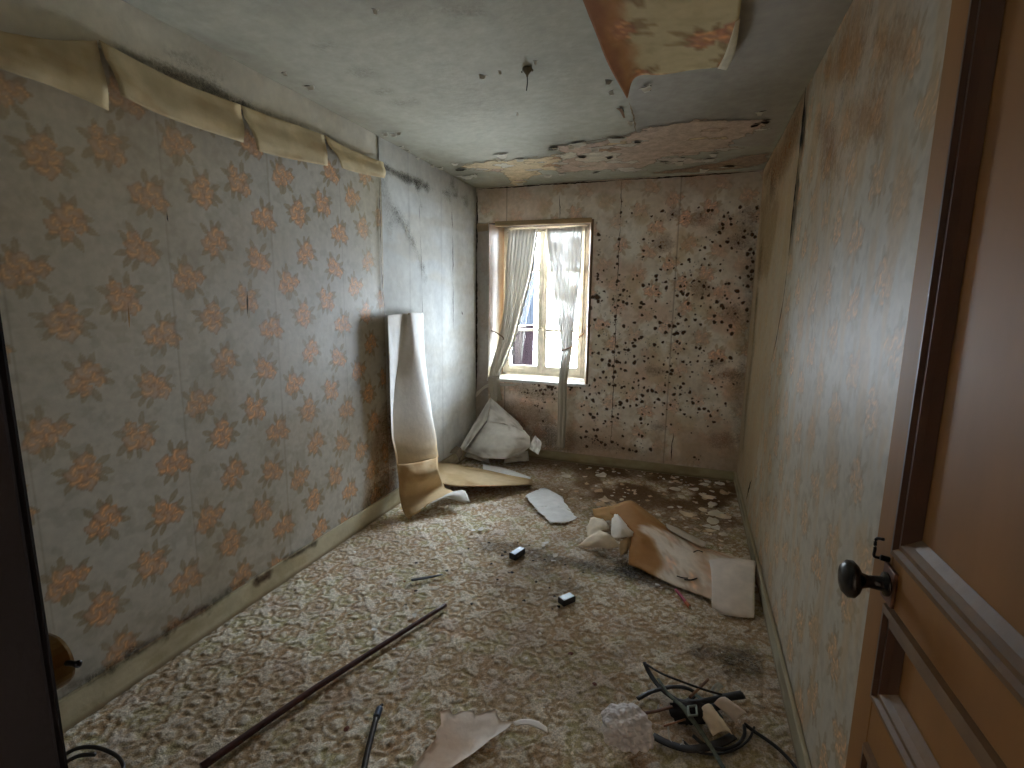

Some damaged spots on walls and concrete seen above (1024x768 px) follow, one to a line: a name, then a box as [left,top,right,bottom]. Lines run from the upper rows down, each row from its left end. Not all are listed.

peeling [381,103,771,186]
leakage [520,205,759,452]
leakage [127,570,271,656]